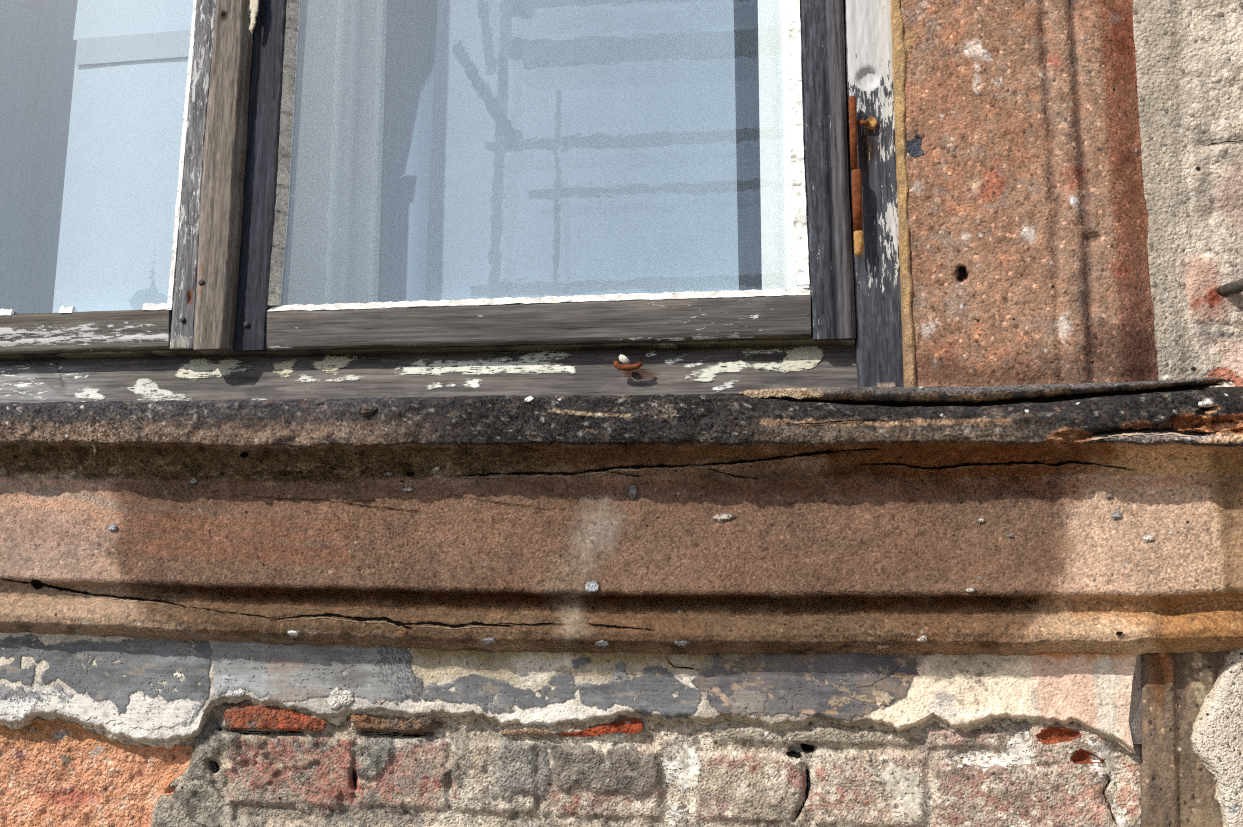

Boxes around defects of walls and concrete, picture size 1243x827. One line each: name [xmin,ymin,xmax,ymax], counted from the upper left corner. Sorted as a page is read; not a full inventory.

peeling [75,388,105,401]
peeling [127,378,191,402]
peeling [175,358,251,380]
peeling [273,355,363,382]
peeling [396,350,575,390]
peeling [646,346,824,399]
spalling [1169,416,1243,433]
crack [452,384,1222,510]
crack [241,494,418,511]
crack [2,579,653,630]
spalling [0,634,918,827]
spalling [1036,726,1105,764]